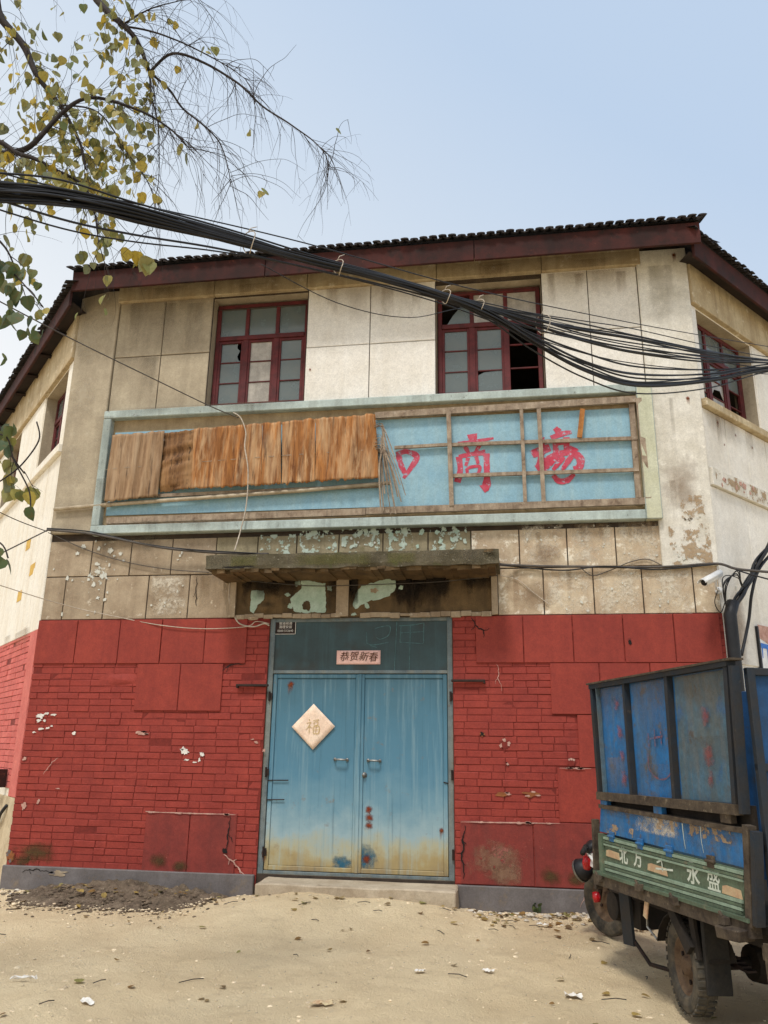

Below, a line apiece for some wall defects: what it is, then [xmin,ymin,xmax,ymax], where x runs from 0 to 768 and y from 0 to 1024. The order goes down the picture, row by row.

peeling [716,472,768,505]
peeling [260,526,467,554]
peeling [650,495,713,613]
peeling [76,540,125,616]
peeling [250,590,265,614]
peeling [284,581,332,613]
peeling [351,579,403,616]
crack [222,816,244,874]
rust [334,848,375,868]
crack [459,826,467,878]